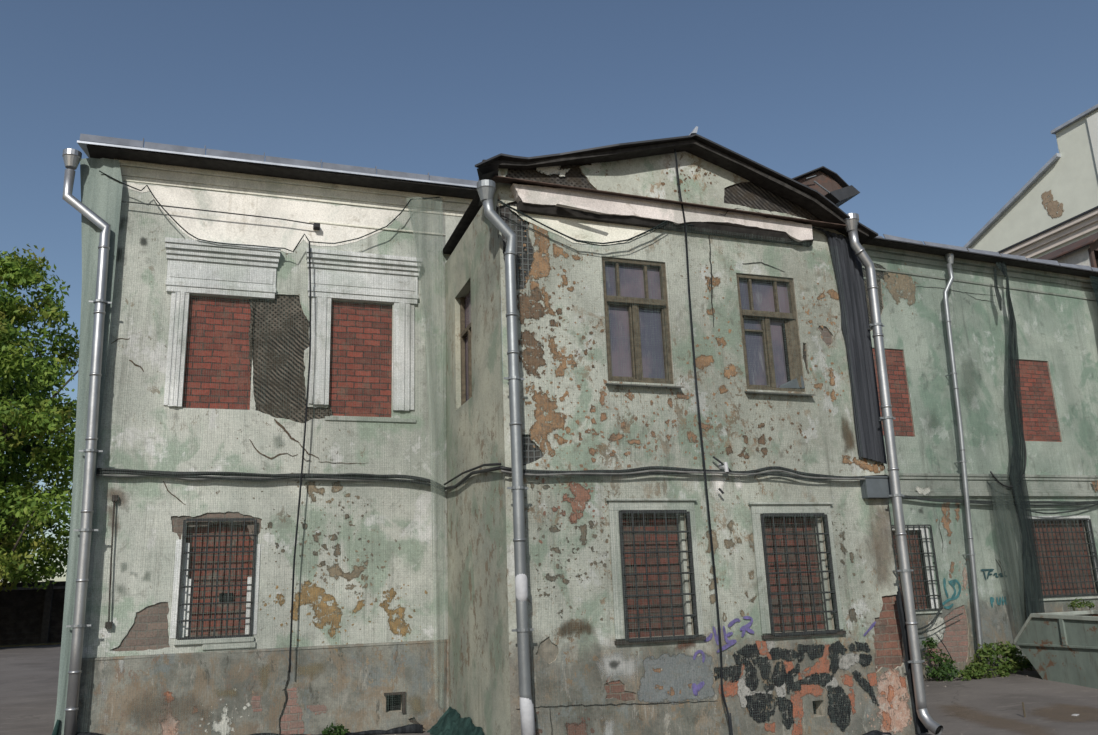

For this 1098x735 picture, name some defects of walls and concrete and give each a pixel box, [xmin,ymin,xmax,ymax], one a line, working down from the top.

peeling [536,166,570,176]
peeling [1042,190,1064,219]
crack [709,208,769,326]
peeling [862,263,922,315]
peeling [801,281,844,417]
crack [251,419,364,464]
peeling [517,220,814,599]
flaking render [111,602,170,651]
peeling [171,480,415,652]
peeling [700,506,757,630]
flaking render [832,513,912,734]
crack [279,667,290,734]